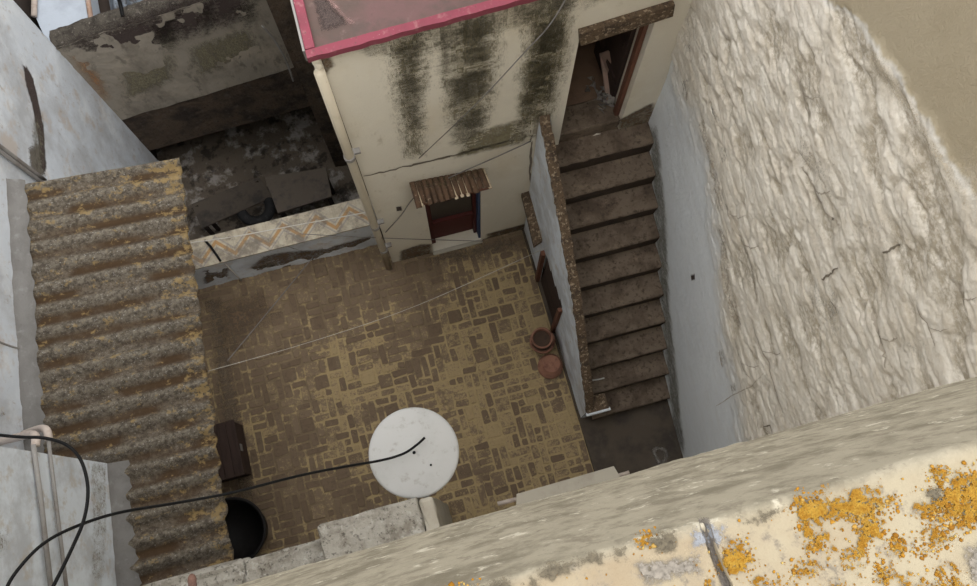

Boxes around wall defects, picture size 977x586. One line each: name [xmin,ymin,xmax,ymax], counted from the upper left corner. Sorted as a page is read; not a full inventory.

water stain [23,66,47,177]
water stain [366,0,579,156]
crack [699,518,730,586]